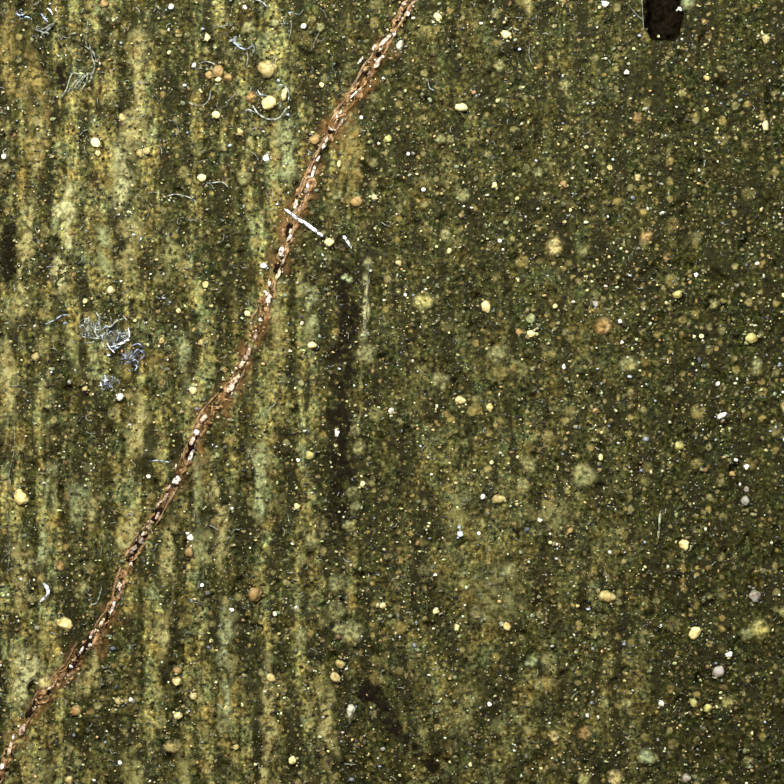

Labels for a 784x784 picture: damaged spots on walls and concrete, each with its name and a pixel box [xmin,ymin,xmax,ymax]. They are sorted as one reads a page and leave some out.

damp [50,61,71,89]
damp [1,223,15,278]
damp [325,259,360,528]